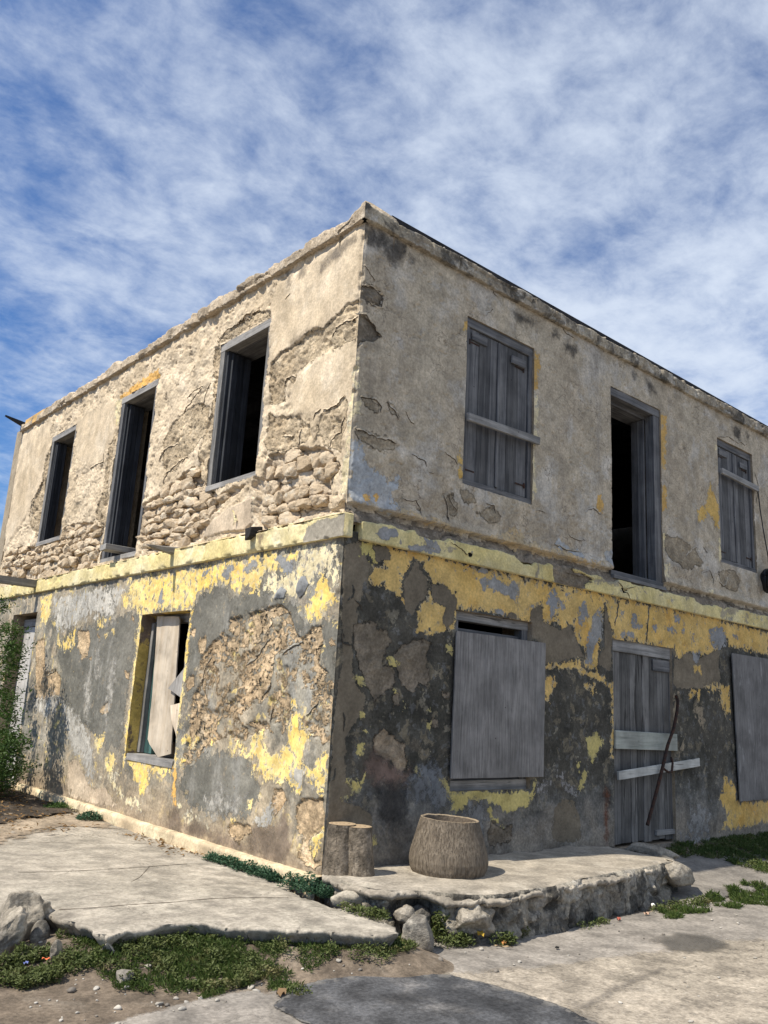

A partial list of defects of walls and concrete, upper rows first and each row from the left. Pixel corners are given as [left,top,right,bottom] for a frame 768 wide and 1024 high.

crack [184,383,210,413]
flaking render [30,447,51,537]
crack [159,442,188,482]
peeling [35,283,768,870]